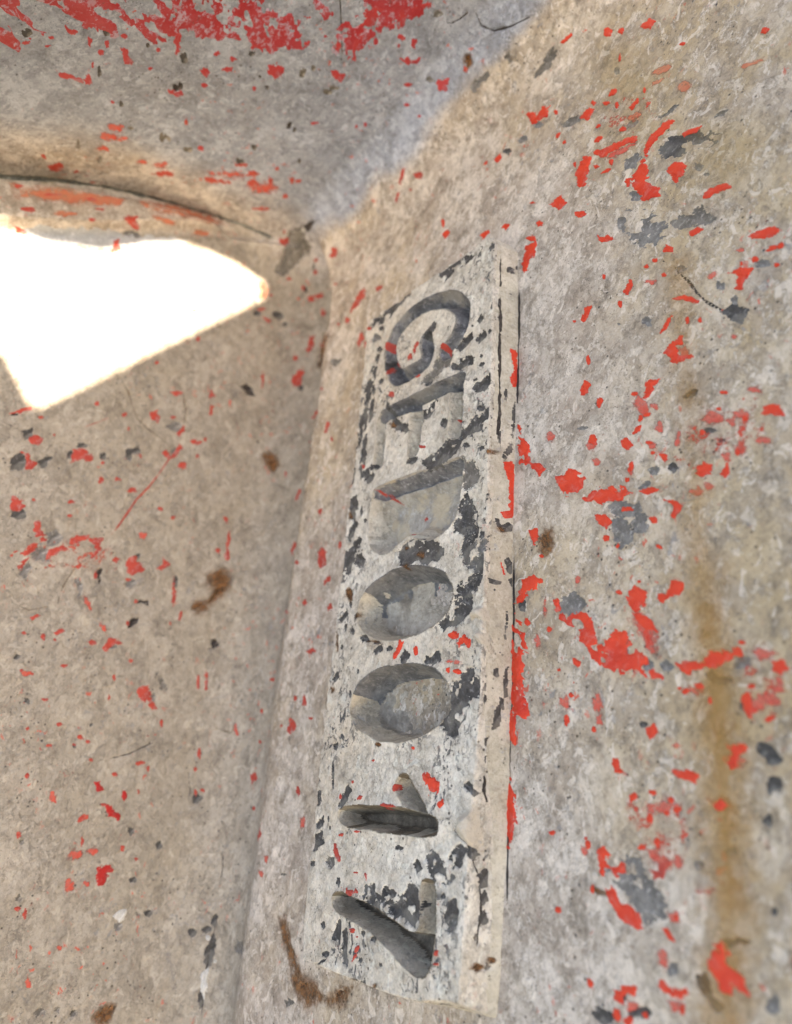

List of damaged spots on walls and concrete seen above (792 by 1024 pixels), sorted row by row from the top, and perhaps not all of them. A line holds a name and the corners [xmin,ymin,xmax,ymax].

peeling [37,0,443,91]
spalling [483,64,732,308]
peeling [707,226,784,290]
peeling [9,495,183,625]
corrosion [191,568,231,613]
peeling [318,292,789,763]
peeling [301,742,489,941]
peeling [506,777,518,849]
corrosion [279,915,353,1007]
peeling [317,919,377,967]
peeling [591,984,652,1024]
spalling [581,790,781,1016]